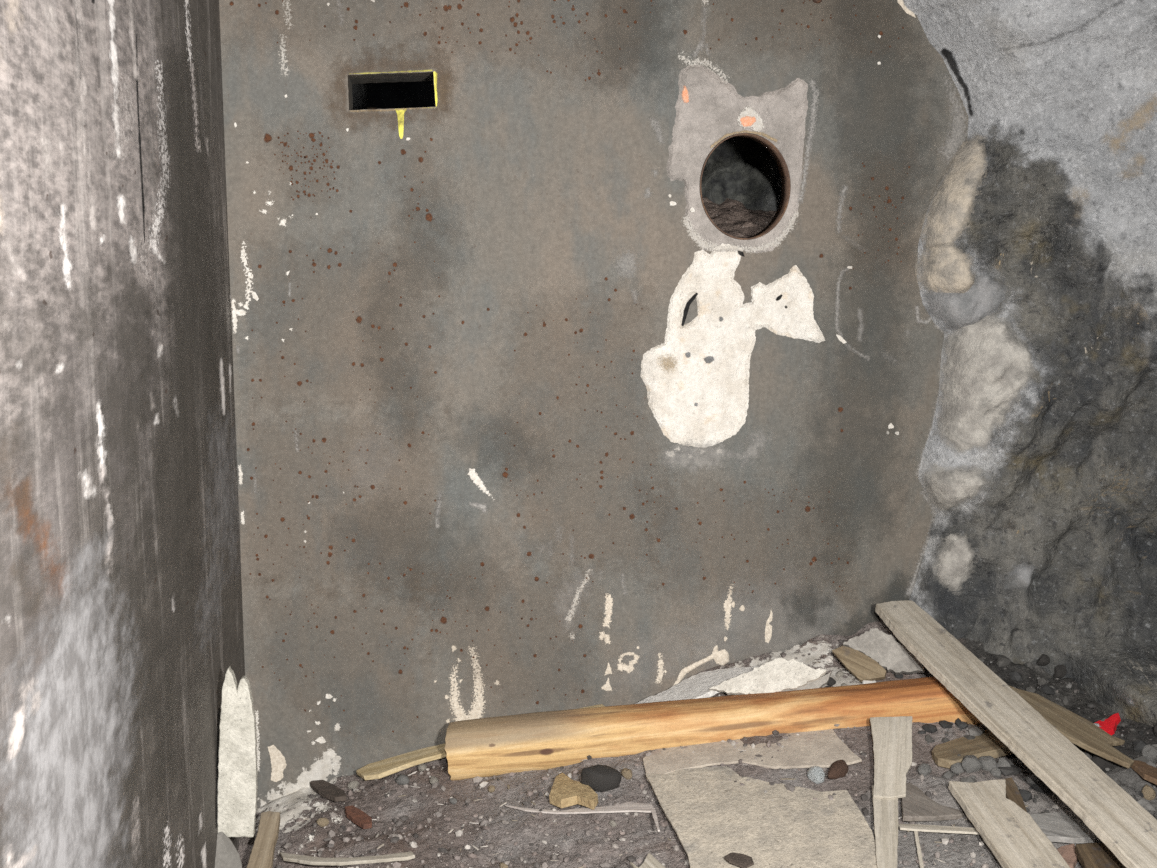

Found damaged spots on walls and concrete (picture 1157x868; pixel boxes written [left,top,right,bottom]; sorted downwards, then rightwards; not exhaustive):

corrosion [264,131,340,200]
spalling [640,52,825,468]
leakage [848,126,1157,727]
peeling [268,745,287,782]